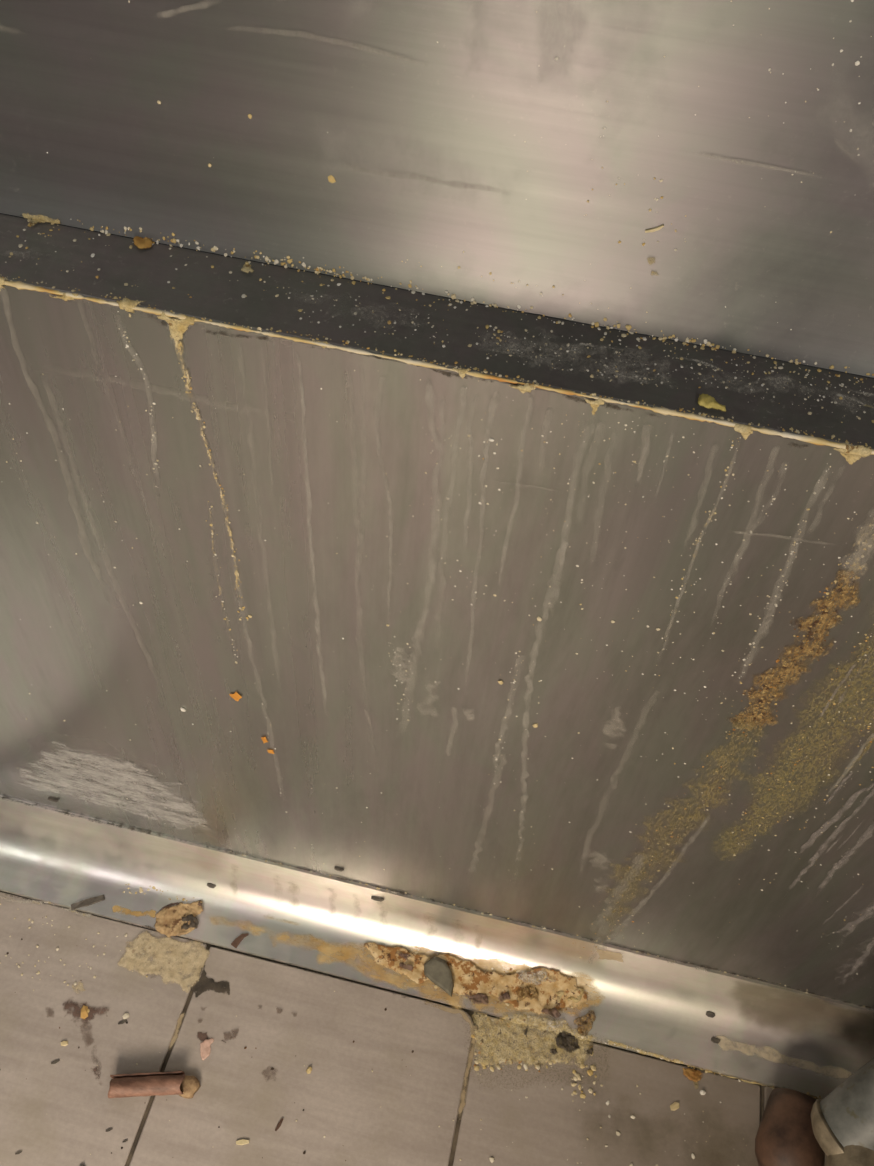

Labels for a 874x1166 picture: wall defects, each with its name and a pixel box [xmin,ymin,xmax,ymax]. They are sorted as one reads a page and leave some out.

rust [579,524,874,963]
water stain [794,784,874,885]